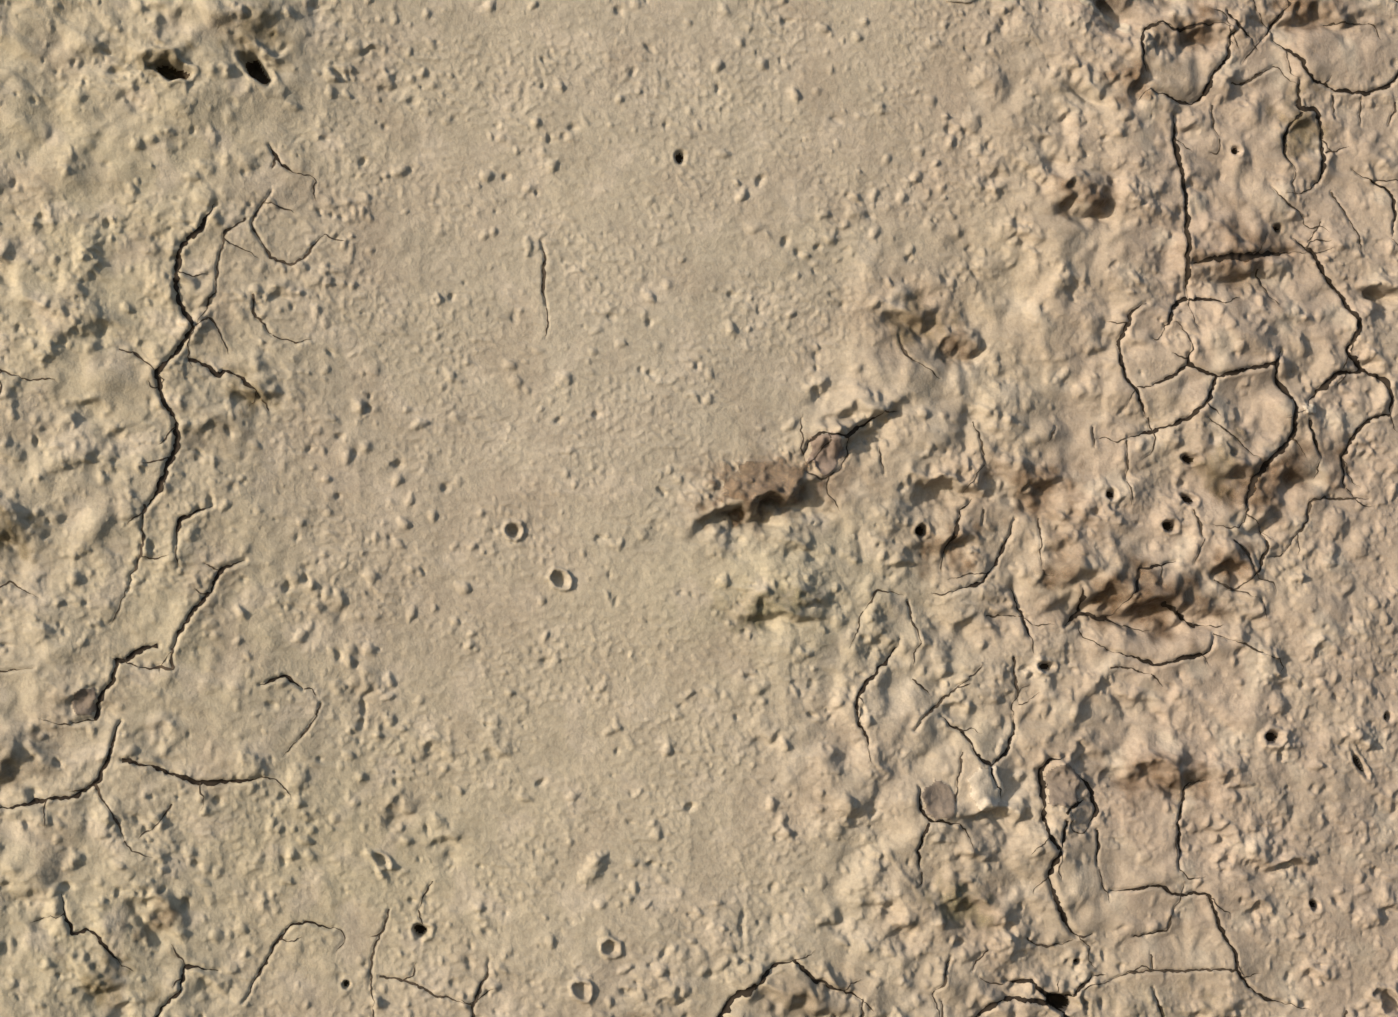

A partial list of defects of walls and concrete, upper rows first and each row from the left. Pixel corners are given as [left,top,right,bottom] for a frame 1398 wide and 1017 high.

crack [0,145,344,858]
spalling [712,431,859,517]
crack [800,410,897,507]
crack [849,0,1398,886]
crack [31,894,133,971]
crack [155,945,218,1017]
crack [245,881,496,1017]
crack [718,955,874,1017]
crack [932,758,1308,1017]